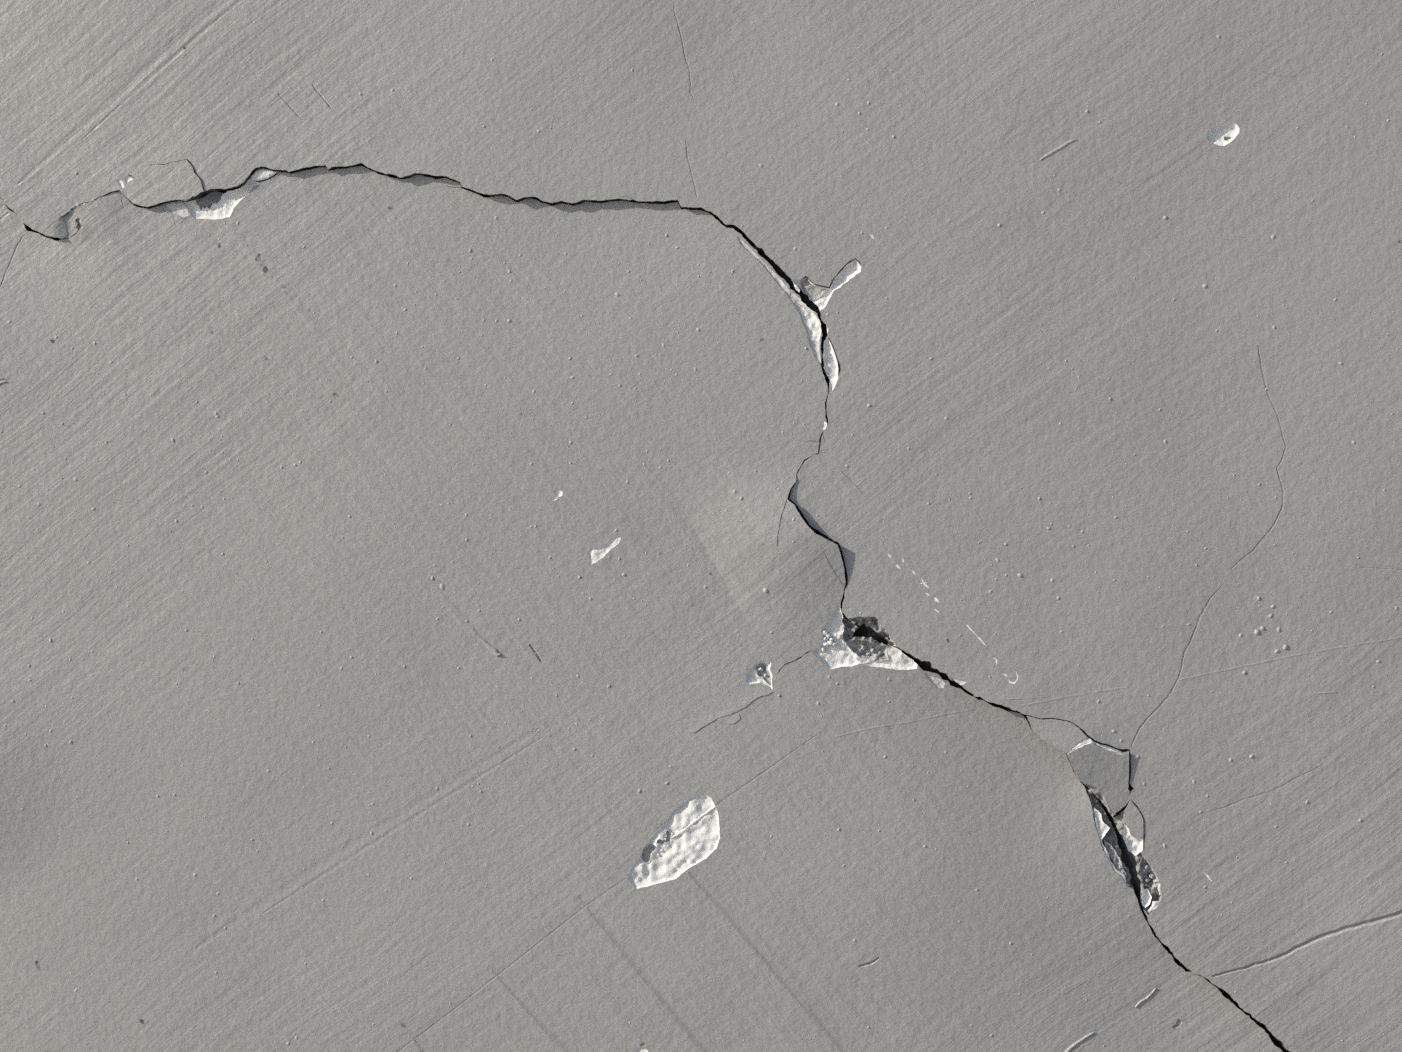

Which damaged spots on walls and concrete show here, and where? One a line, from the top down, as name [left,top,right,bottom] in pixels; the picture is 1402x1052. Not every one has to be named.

crack [673,2,694,100]
flaking render [165,170,279,220]
flaking render [737,237,862,393]
crack [0,138,864,627]
flaking render [812,604,917,670]
crack [889,346,1290,1052]
crack [1197,765,1321,815]
peeling [628,794,720,889]
flaking render [1084,784,1162,915]